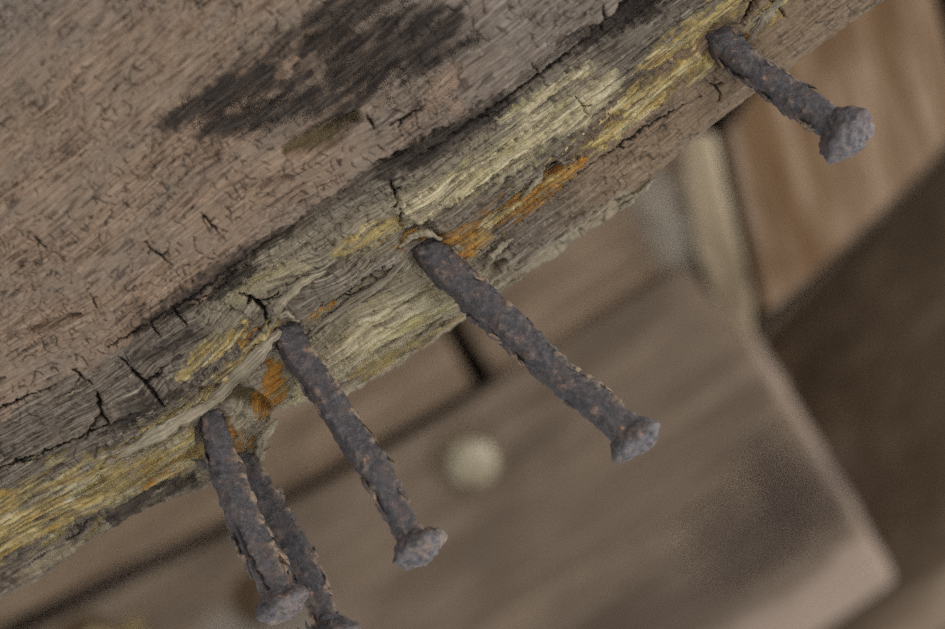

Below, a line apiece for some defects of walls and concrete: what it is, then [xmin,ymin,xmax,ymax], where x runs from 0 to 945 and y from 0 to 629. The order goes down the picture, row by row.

crack [366,105,424,128]
crack [439,5,606,144]
crack [577,82,723,173]
crack [390,181,402,217]
rust [395,156,588,281]
crack [108,256,279,405]
rust [251,358,308,422]
rust [266,526,297,584]